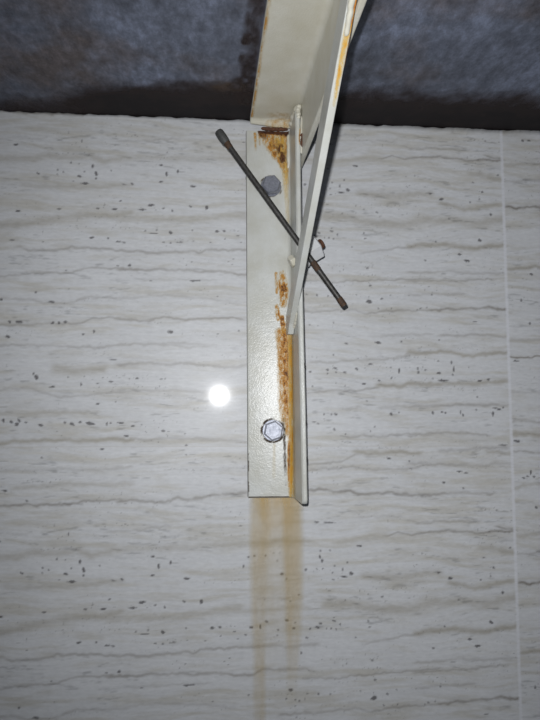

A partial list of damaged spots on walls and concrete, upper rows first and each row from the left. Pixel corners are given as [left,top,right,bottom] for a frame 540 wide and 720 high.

corrosion [254,120,289,184]
corrosion [275,272,294,501]